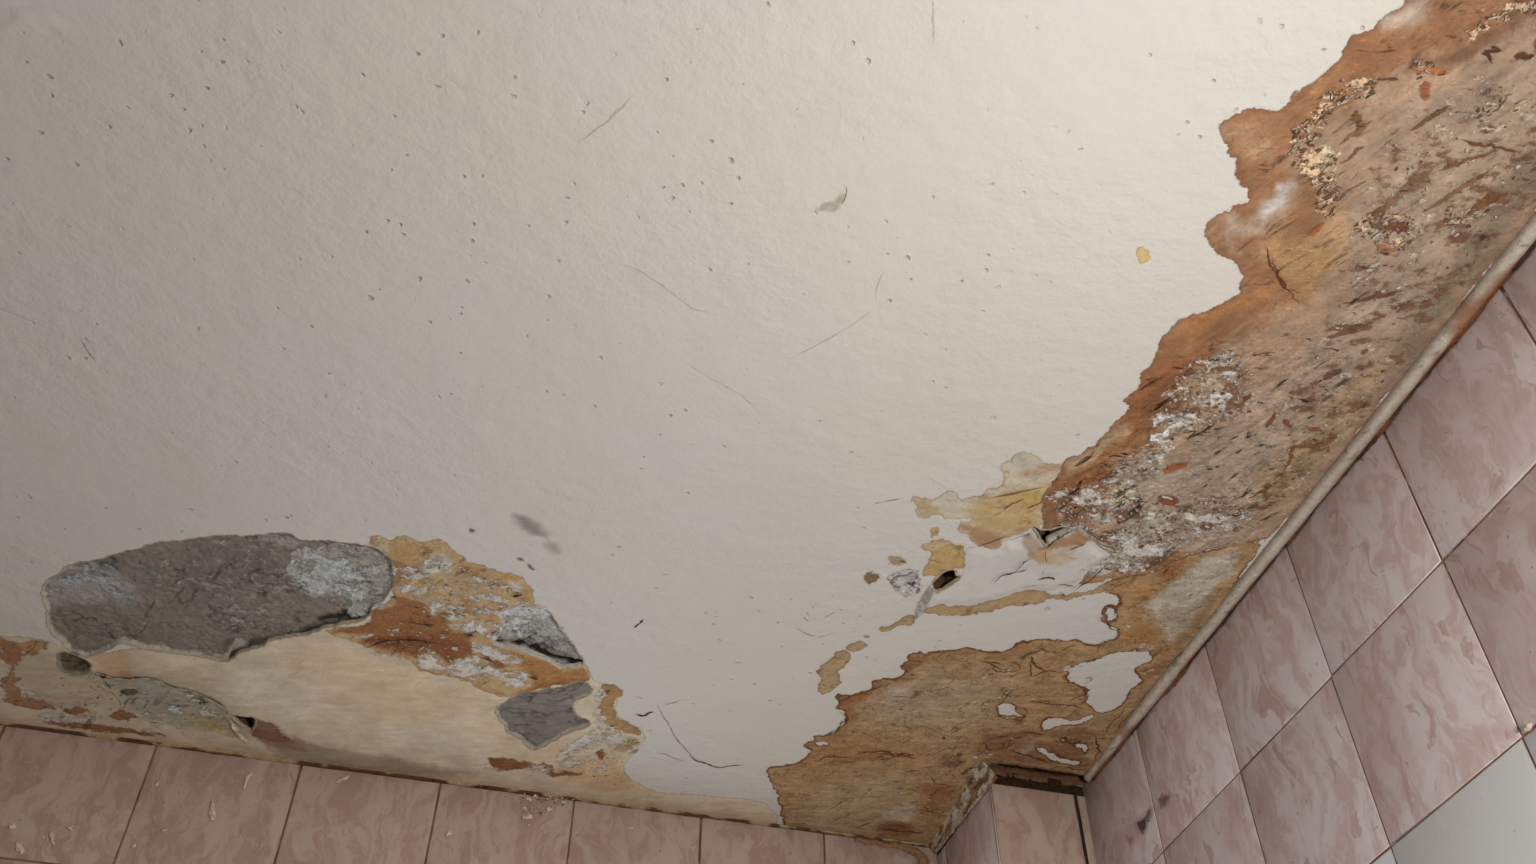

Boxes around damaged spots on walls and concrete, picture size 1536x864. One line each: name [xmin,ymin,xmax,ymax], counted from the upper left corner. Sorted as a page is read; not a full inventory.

flaking render [29,532,396,744]
flaking render [493,604,594,751]
peeling [887,525,1117,620]
flaking render [929,760,1088,855]